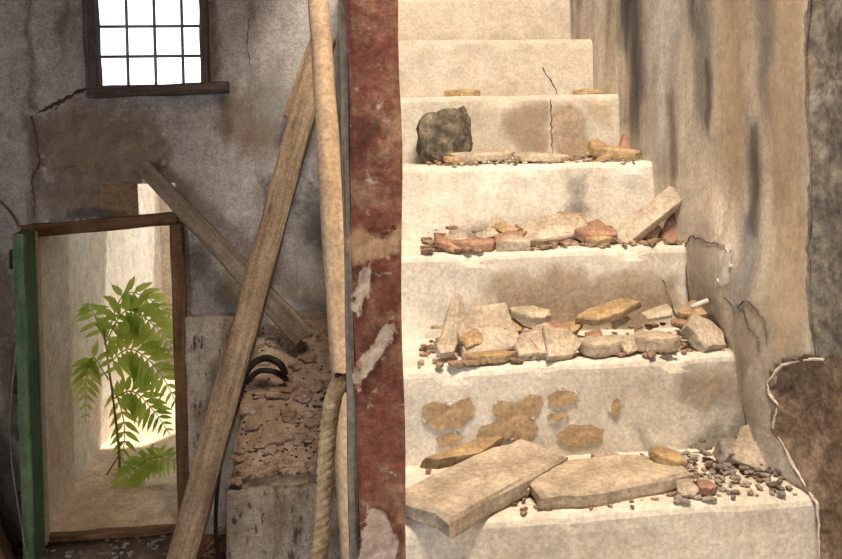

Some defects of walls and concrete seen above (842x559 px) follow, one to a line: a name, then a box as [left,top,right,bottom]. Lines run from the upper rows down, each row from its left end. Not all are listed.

crack [30,87,86,221]
damp [553,104,588,156]
damp [621,0,681,175]
damp [692,0,710,123]
damp [296,203,327,306]
peeling [352,318,394,392]
peeling [348,225,401,317]
crack [723,297,749,329]
damp [733,127,759,312]
flaking render [766,0,842,559]
flaking render [476,386,604,446]
peeling [355,504,399,559]